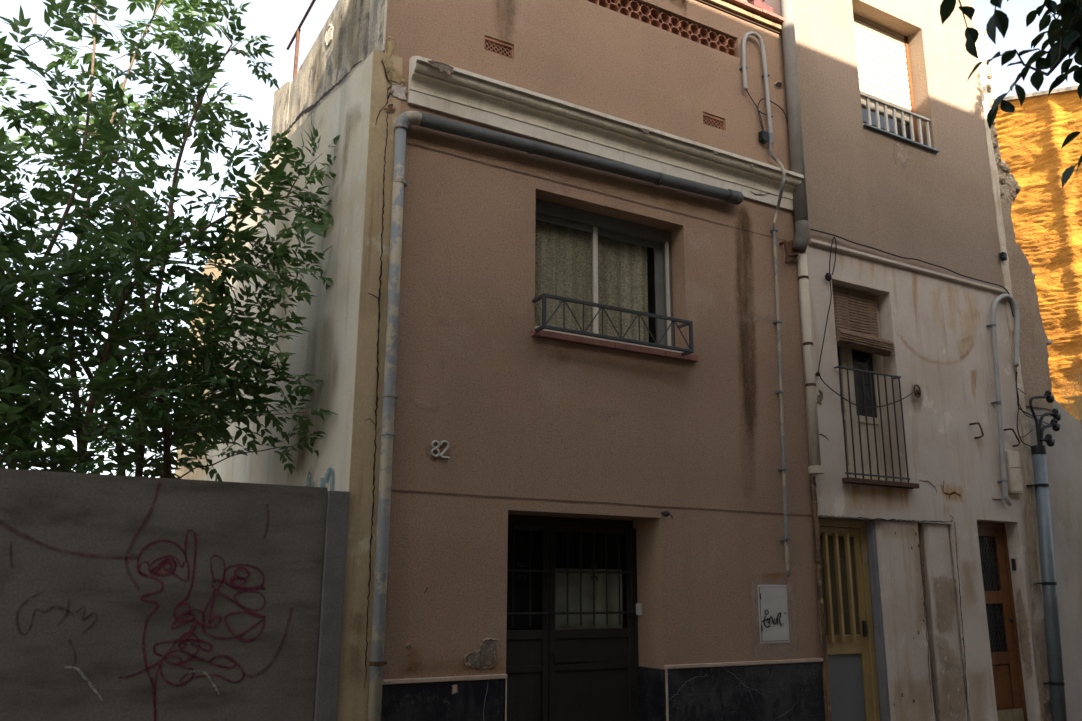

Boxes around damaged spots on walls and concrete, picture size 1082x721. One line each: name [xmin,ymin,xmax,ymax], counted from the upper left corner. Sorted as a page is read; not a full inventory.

crack [276,59,406,689]
spalling [464,637,499,671]